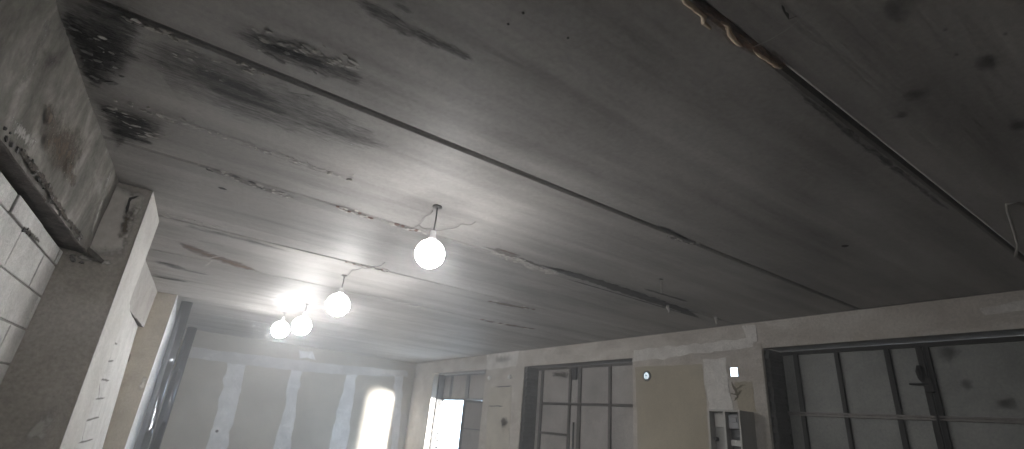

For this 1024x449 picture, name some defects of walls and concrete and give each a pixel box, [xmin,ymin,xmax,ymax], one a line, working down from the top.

damp [61,4,138,85]
damp [240,27,361,82]
damp [363,2,469,59]
damp [88,98,169,145]
damp [150,46,378,146]
spalling [3,126,104,263]